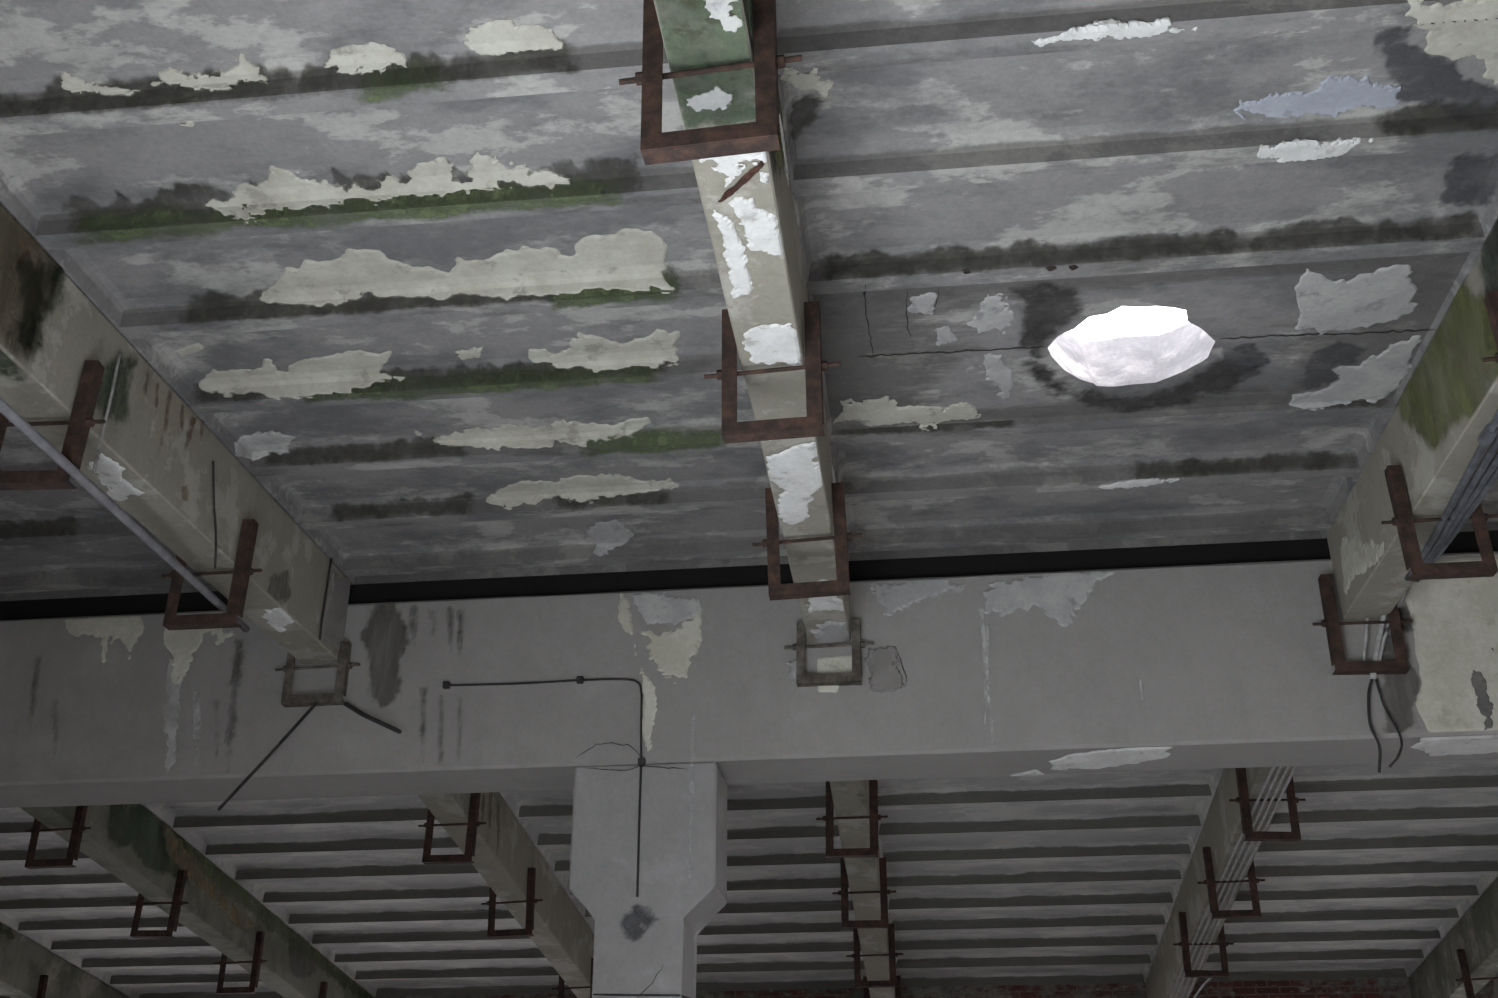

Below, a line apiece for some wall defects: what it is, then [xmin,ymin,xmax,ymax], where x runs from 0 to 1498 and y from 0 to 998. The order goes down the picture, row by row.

leakage [1374,28,1498,135]
peeling [204,152,571,225]
peeling [699,114,789,298]
peeling [259,228,676,307]
leakage [824,154,1498,413]
peeling [1294,264,1418,335]
peeling [194,350,405,400]
peeling [455,347,483,360]
leakage [362,603,416,707]
peeling [617,591,703,752]